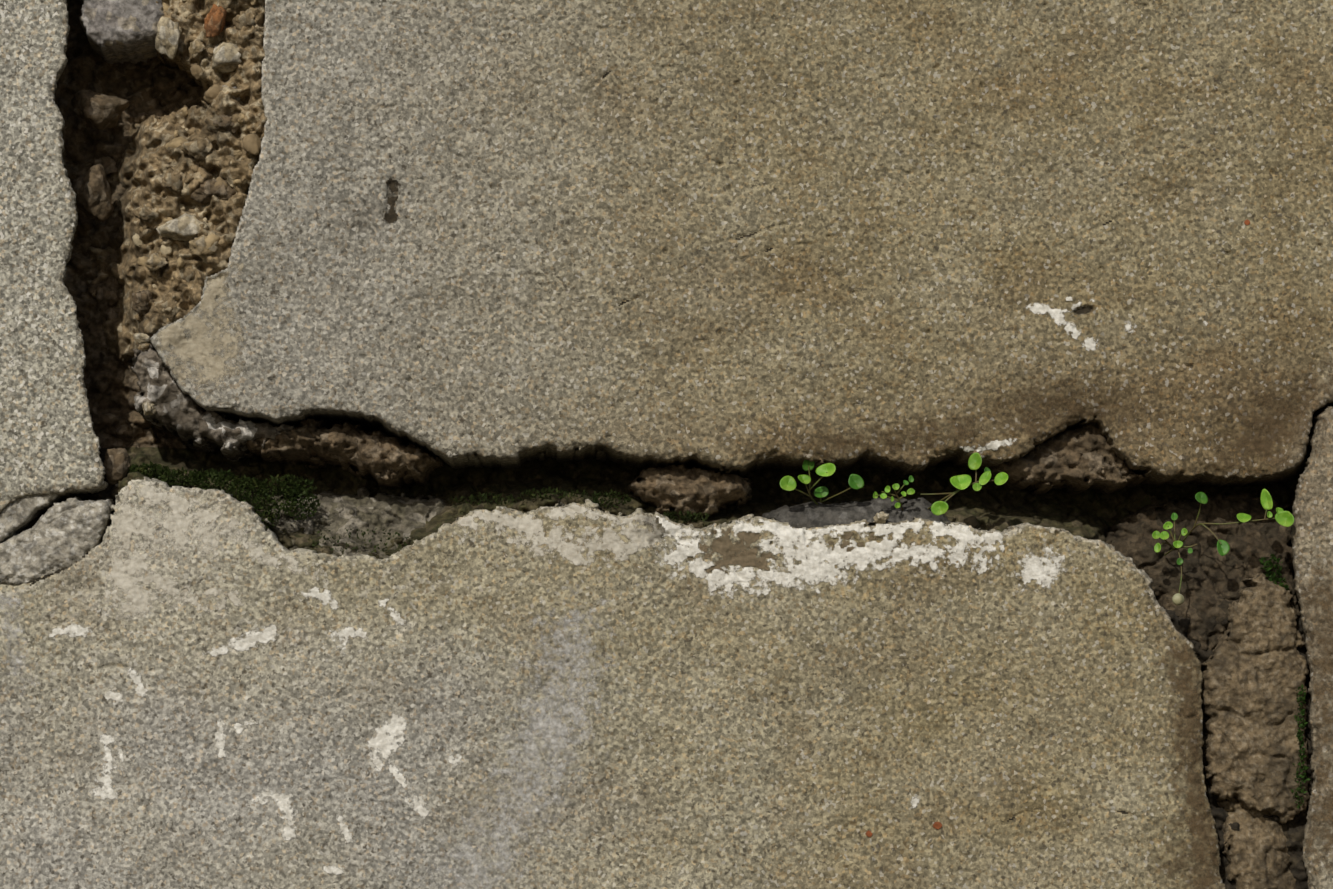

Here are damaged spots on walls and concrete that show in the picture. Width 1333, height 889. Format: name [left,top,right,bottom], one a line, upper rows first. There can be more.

spalling [86,0,297,462]
crack [18,0,1303,578]
spalling [990,422,1146,497]
crack [30,555,85,586]
water stain [452,504,1005,599]
spalling [687,526,777,574]
spalling [828,531,876,552]
water stain [1015,547,1066,592]
crack [1165,608,1229,671]
crack [1201,607,1313,889]